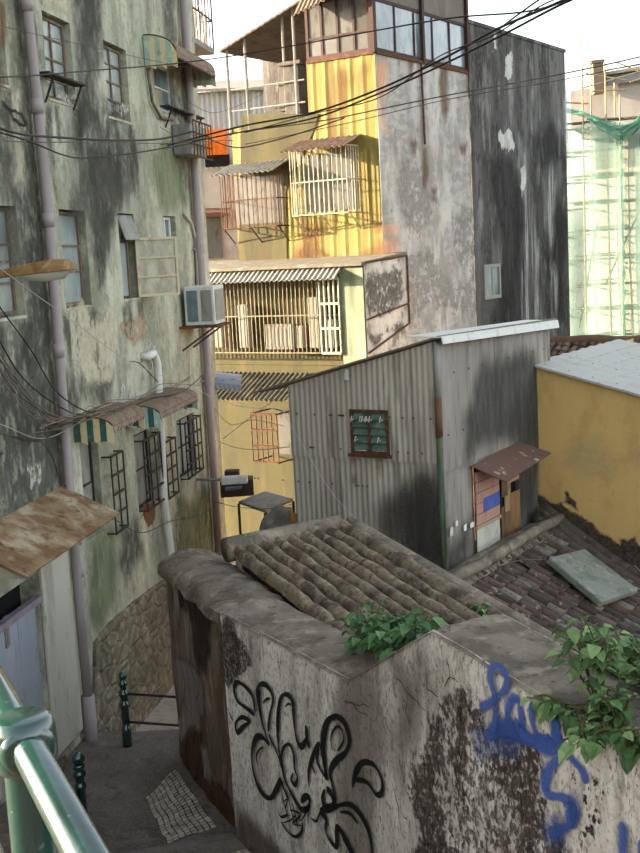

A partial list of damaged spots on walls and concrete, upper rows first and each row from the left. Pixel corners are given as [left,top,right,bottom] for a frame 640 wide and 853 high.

damp [165,0,177,43]
damp [47,107,60,147]
damp [72,0,138,282]
damp [558,82,570,146]
damp [518,151,539,320]
damp [547,168,555,246]
damp [467,353,539,457]
damp [515,462,640,570]
damp [176,589,280,853]